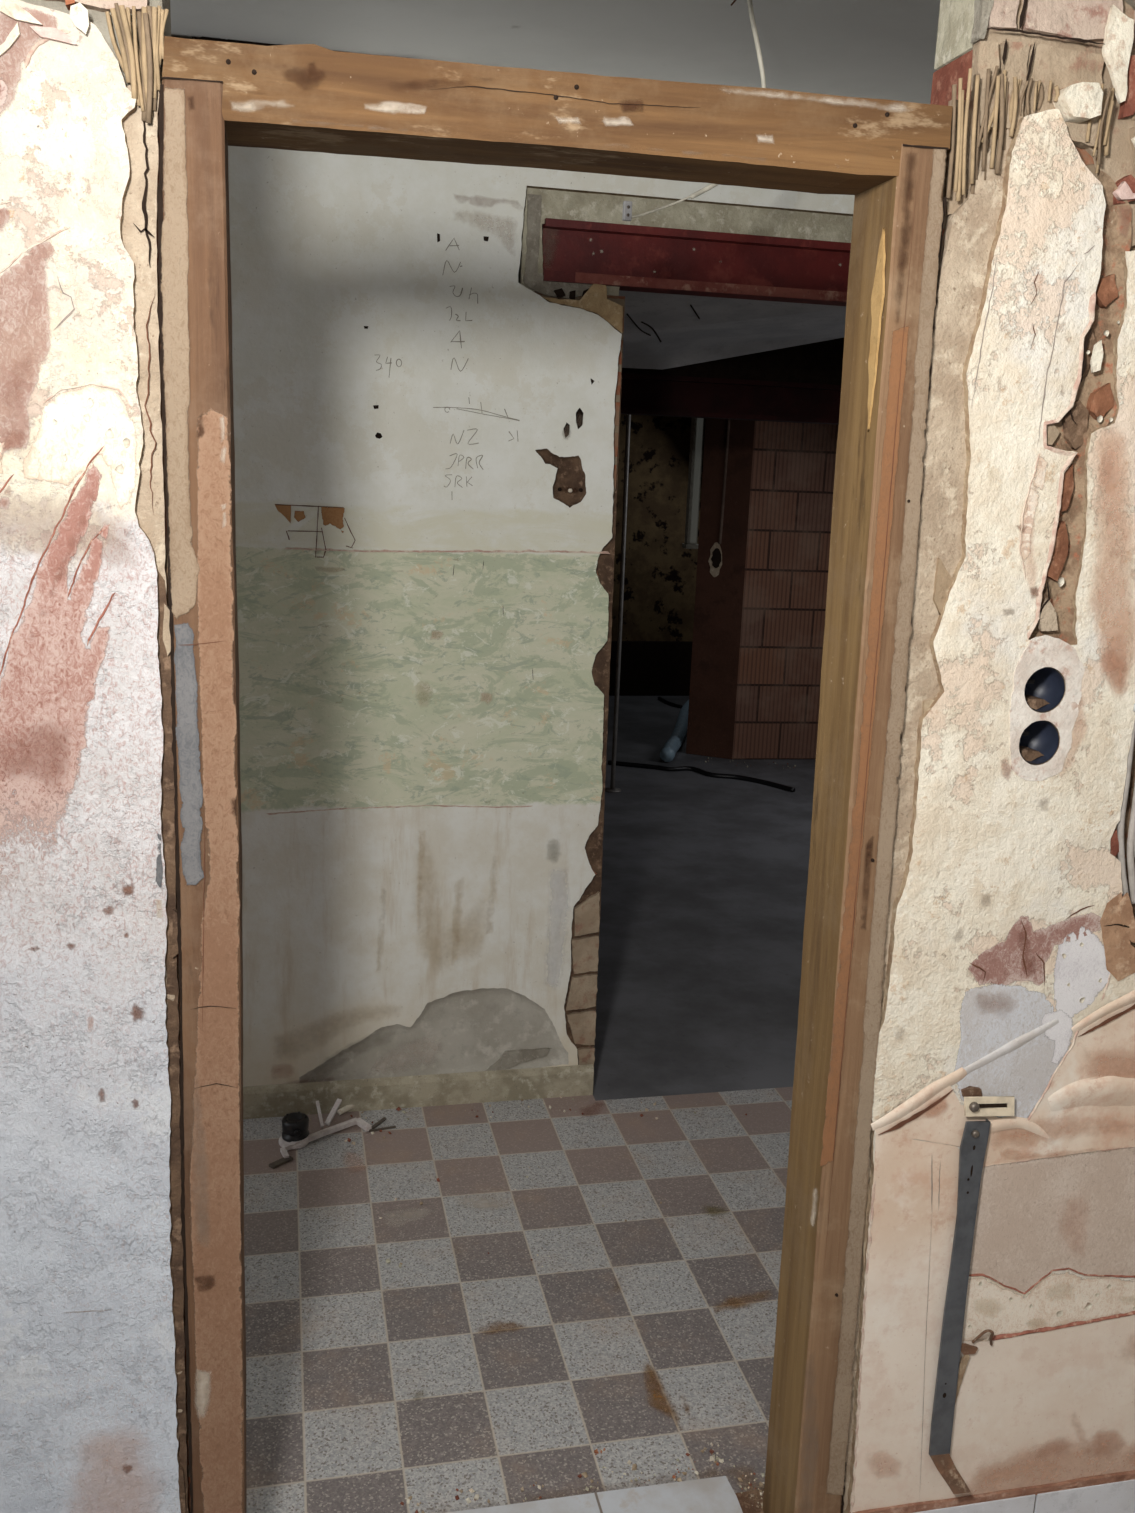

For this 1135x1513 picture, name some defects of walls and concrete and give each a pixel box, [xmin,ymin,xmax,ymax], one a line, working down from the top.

peeling [0,0,243,1513]
peeling [275,504,355,558]
spalling [299,284,623,1083]
spalling [841,1131,877,1513]
peeling [820,326,909,1167]
spalling [880,0,1135,1022]
peeling [955,905,1111,1118]
peeling [962,1148,1135,1341]